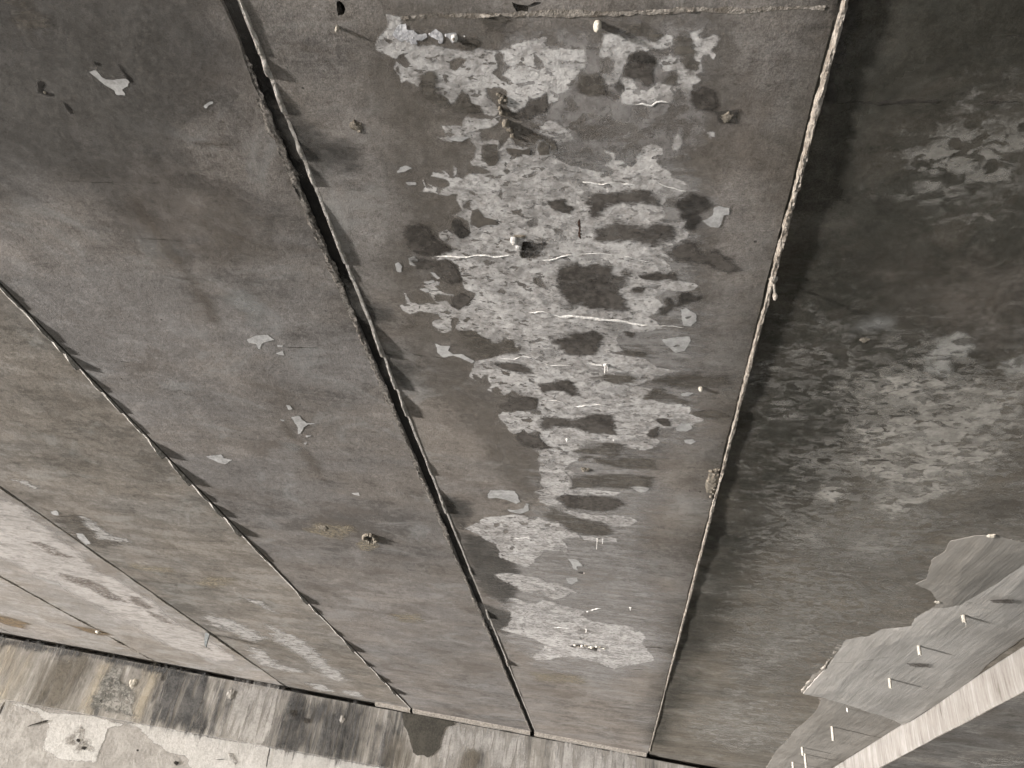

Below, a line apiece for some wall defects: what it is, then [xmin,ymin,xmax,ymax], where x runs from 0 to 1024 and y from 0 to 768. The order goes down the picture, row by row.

peeling [90,62,133,95]
spalling [716,110,739,124]
peeling [702,206,730,228]
peeling [247,335,284,355]
peeling [662,308,697,353]
damp [371,0,1024,753]
peeling [280,405,315,445]
peeling [206,454,232,464]
spalling [801,645,842,693]
peeling [12,703,383,768]
damp [86,664,526,768]